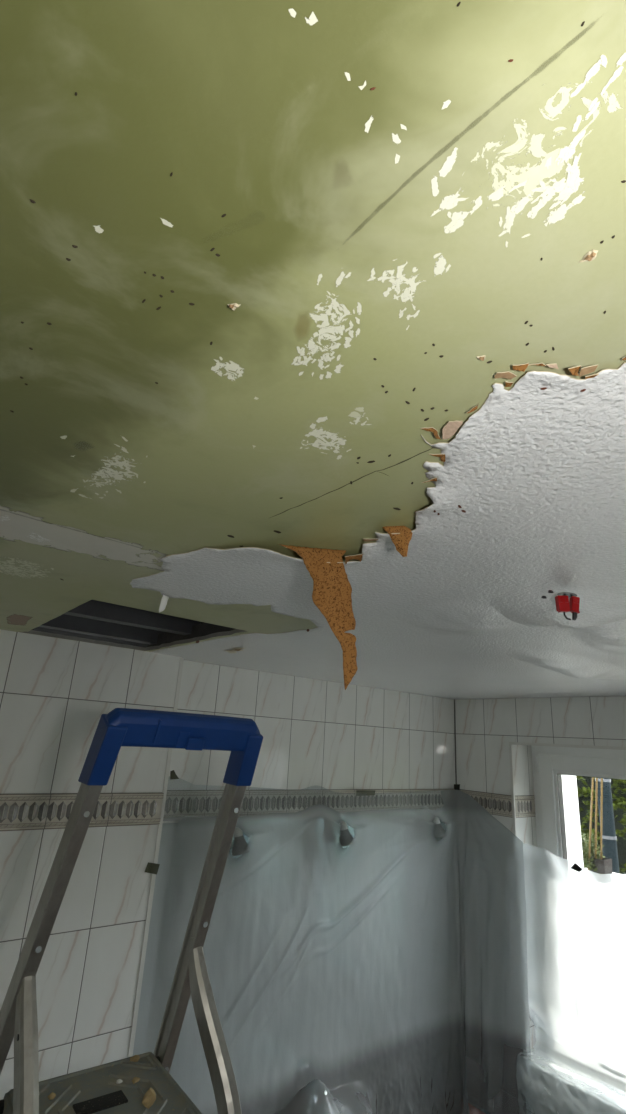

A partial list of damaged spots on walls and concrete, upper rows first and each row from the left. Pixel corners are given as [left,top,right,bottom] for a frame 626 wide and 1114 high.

peeling [431,53,626,248]
peeling [367,267,420,330]
peeling [211,356,228,376]
peeling [291,302,362,380]
peeling [476,347,599,392]
peeling [300,416,375,464]